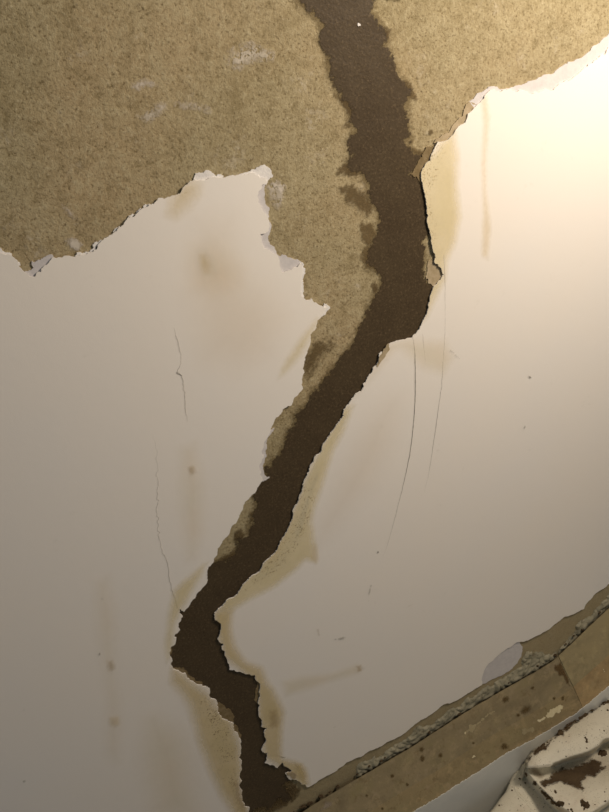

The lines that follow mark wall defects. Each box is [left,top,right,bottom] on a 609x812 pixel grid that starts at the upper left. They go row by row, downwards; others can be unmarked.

peeling [371,0,609,186]
peeling [0,0,382,481]
peeling [421,233,443,286]
leakage [170,0,433,812]
peeling [214,495,257,563]
peeling [217,702,241,739]
peeling [271,584,609,812]